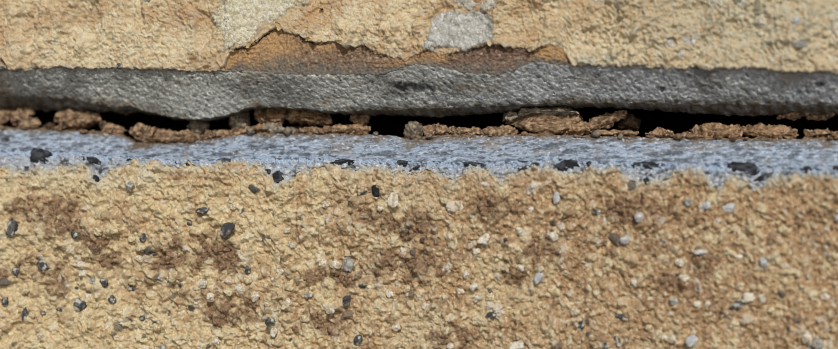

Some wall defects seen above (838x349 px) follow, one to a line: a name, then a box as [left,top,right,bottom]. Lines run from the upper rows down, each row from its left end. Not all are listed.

spalling [212,0,572,76]